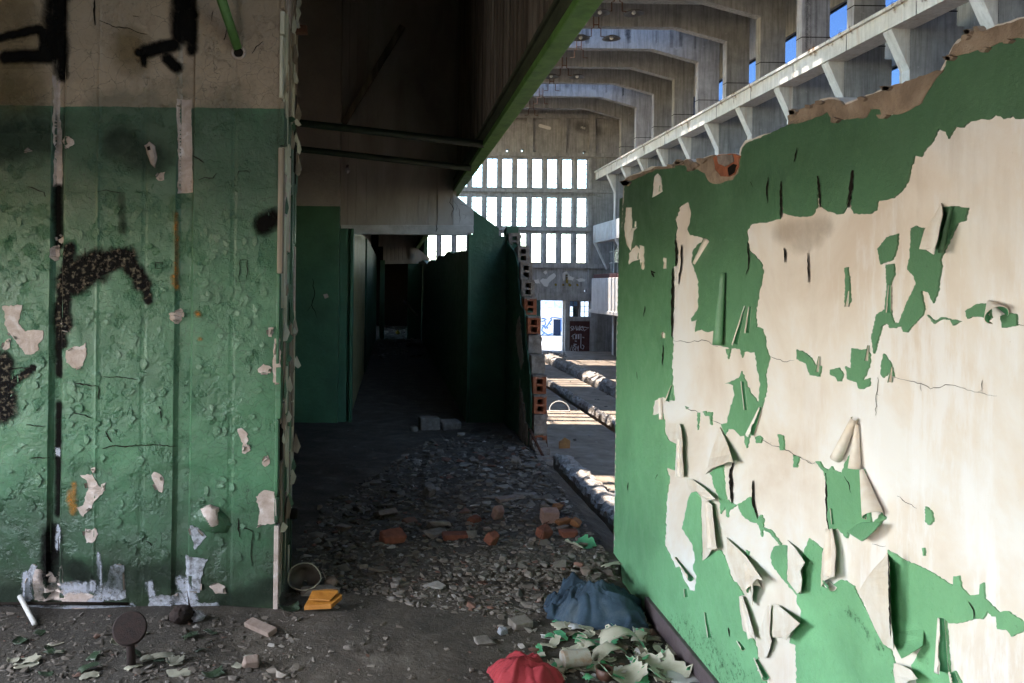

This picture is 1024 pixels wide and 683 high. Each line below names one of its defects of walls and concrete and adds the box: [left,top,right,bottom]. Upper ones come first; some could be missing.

spalling [52,75,74,186]
spalling [176,99,193,194]
spalling [1,305,44,389]
spalling [64,342,87,428]
peeling [550,18,1024,683]
crack [875,377,992,411]
corrosion [67,483,77,514]
spalling [17,563,129,609]
spalling [73,436,106,516]
spalling [82,528,98,543]
spalling [148,525,226,606]
spalling [240,404,301,540]